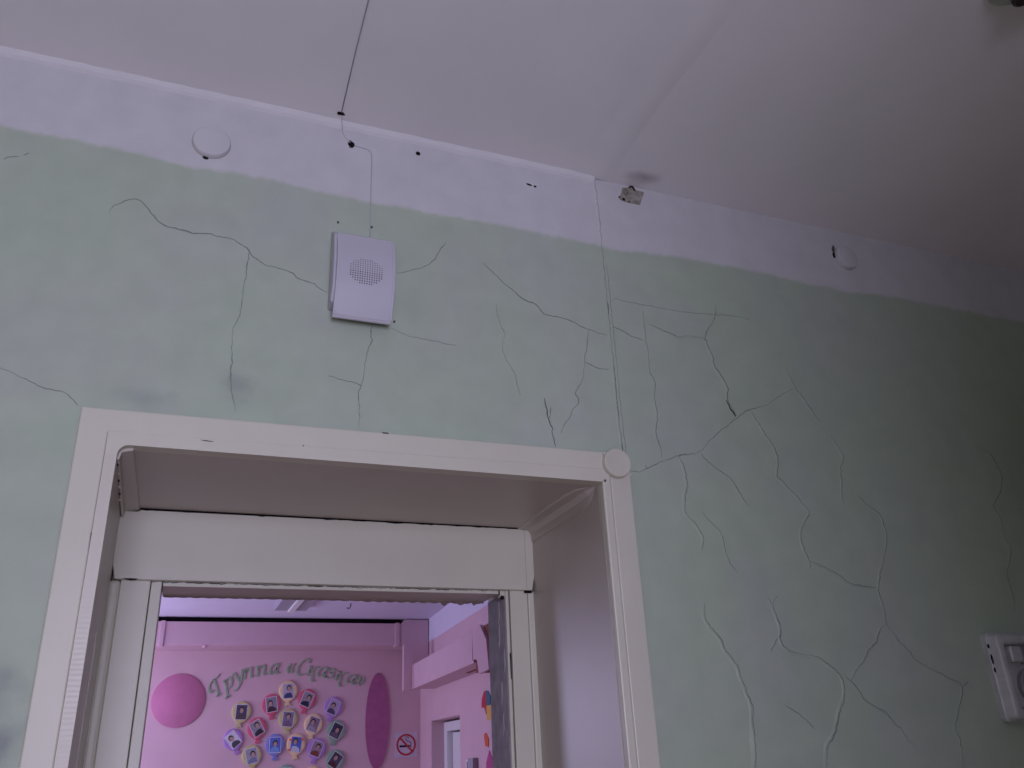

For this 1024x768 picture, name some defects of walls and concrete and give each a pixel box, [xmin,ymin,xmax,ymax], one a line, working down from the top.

crack [1,368,78,406]
crack [114,198,326,405]
crack [331,327,456,428]
crack [484,180,875,589]
crack [701,605,757,768]
crack [767,595,845,768]